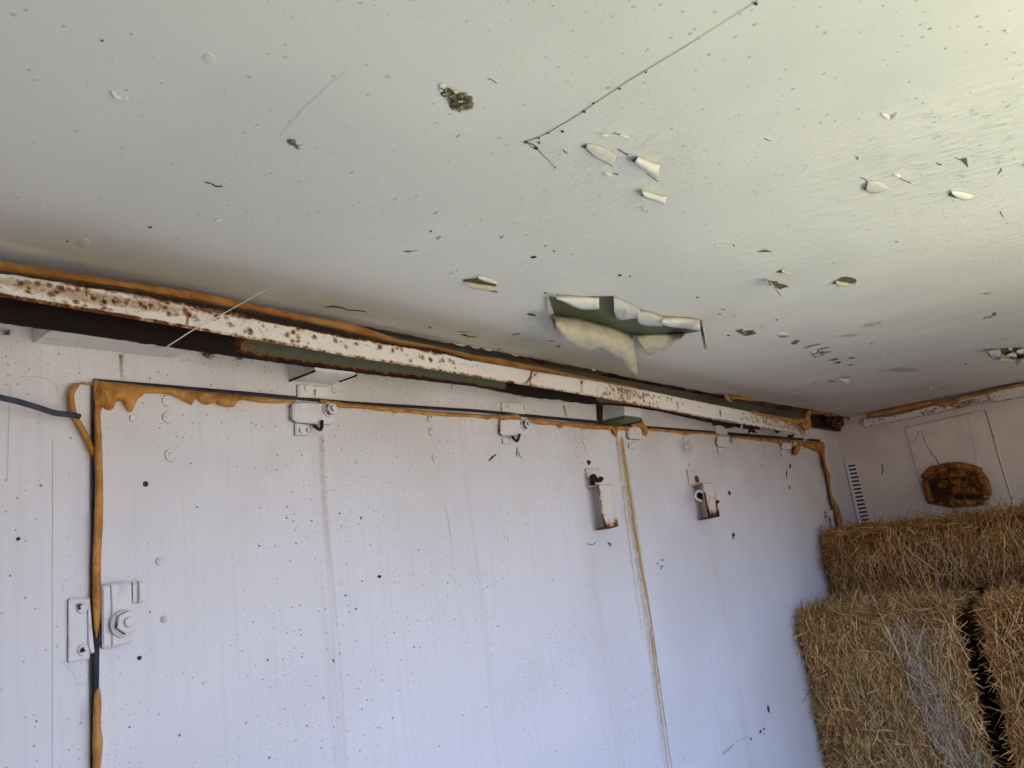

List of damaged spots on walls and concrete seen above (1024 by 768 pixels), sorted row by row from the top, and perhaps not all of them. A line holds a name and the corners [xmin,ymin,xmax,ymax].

crack [524,0,759,168]
peeling [581,133,630,178]
peeling [631,156,667,205]
peeling [947,190,974,201]
peeling [449,270,498,293]
rust [0,277,456,369]
peeling [358,292,854,419]
peeling [988,338,1024,367]
rust [741,413,844,431]